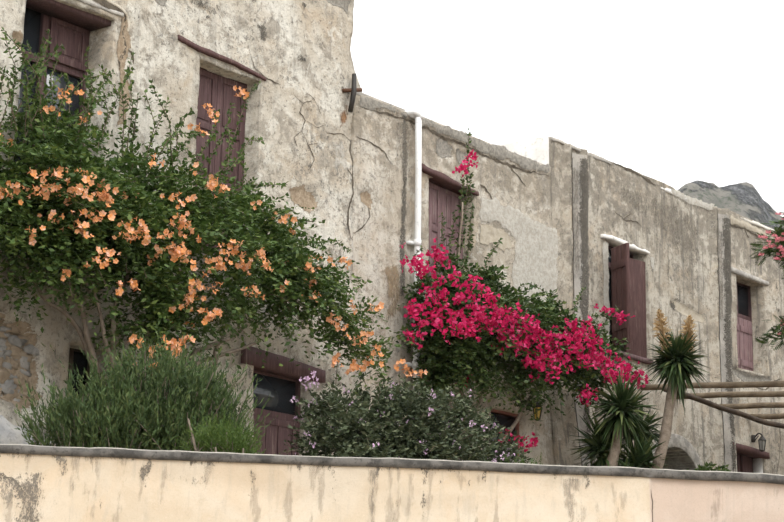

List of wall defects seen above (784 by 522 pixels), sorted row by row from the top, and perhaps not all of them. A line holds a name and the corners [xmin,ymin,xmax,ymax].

crack [294,95,390,239]
leakage [0,472,44,522]